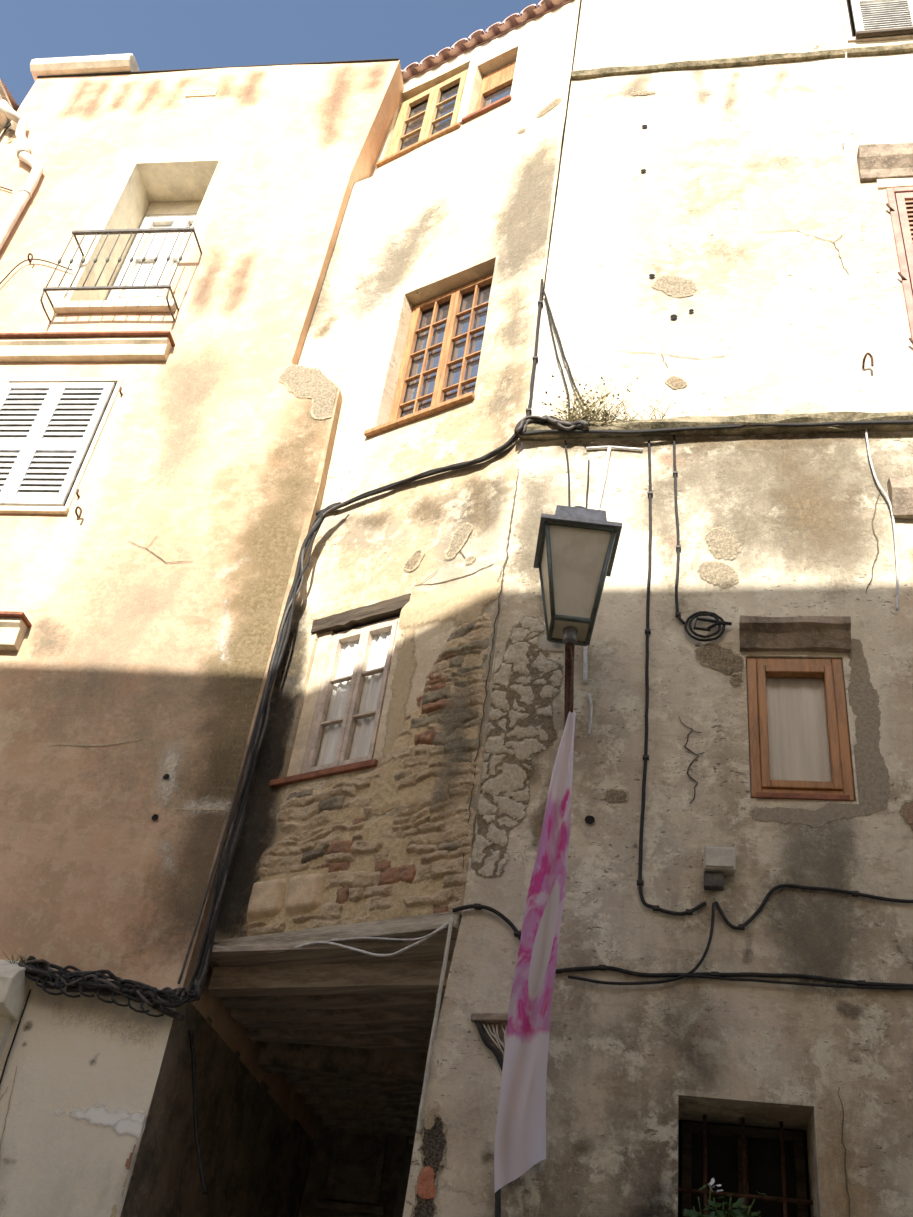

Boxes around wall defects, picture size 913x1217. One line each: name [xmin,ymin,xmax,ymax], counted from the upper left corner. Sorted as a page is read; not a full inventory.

leakage [497,146,555,278]
flaking render [278,364,338,419]
crack [128,536,190,563]
leakage [158,466,319,938]
flaking render [243,612,565,936]
crack [679,717,705,804]
crack [0,1066,17,1157]
peeling [60,1106,145,1197]
flaking render [411,1102,447,1217]